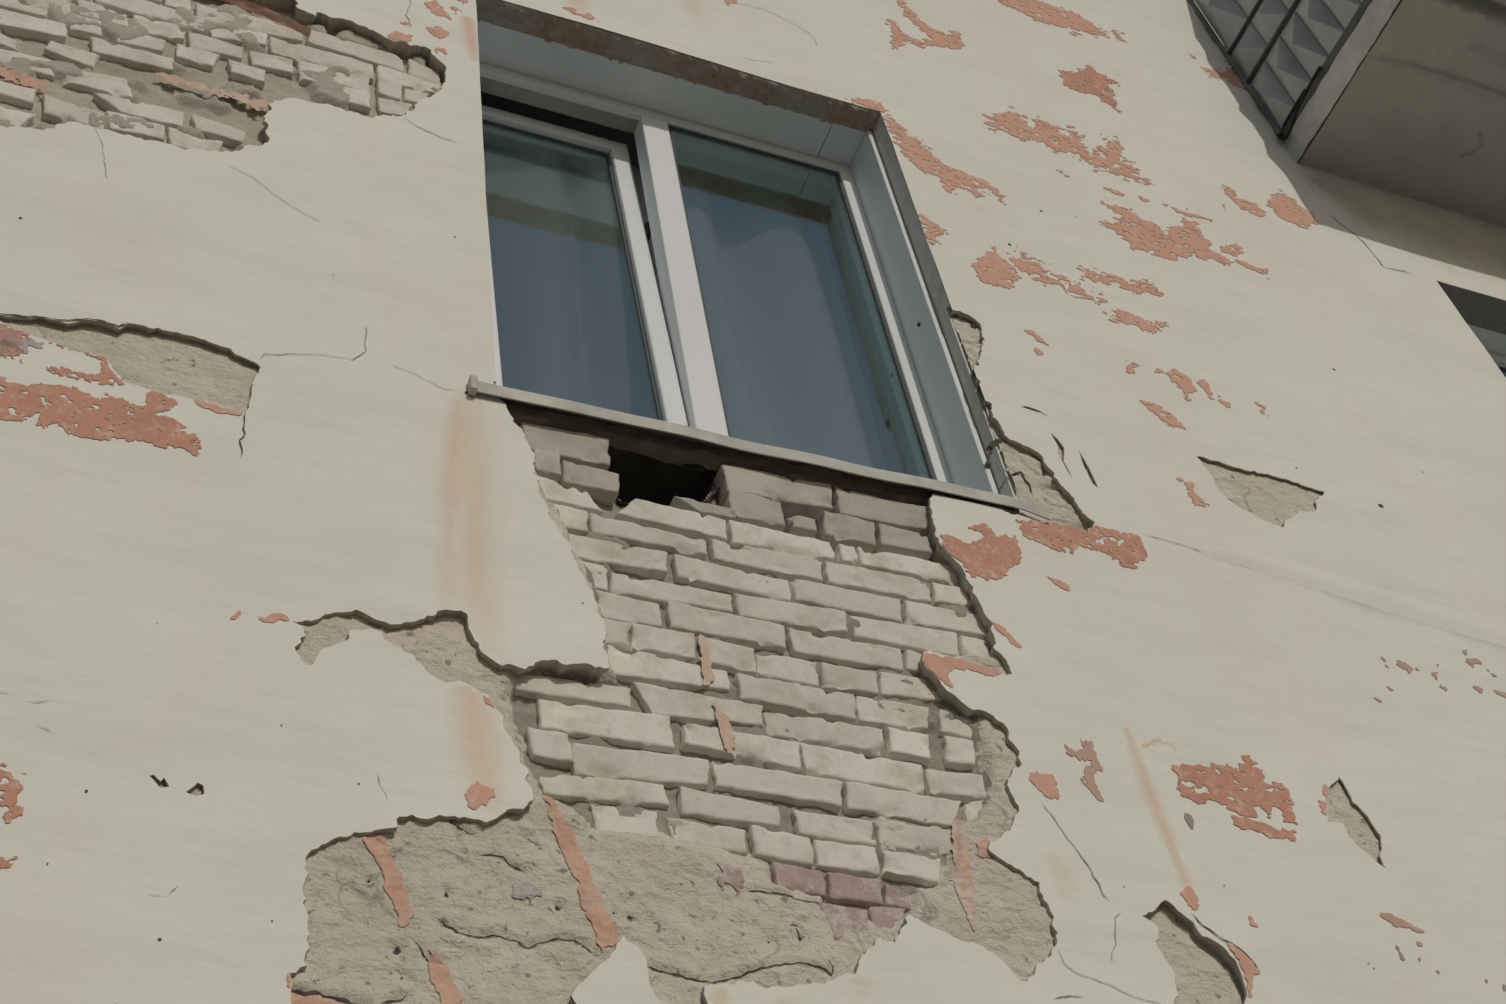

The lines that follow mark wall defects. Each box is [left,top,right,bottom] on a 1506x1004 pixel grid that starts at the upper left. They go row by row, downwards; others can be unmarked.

flaking render [0,0,1006,205]
peeling [1058,65,1122,112]
peeling [983,106,1321,279]
peeling [971,243,1168,334]
flaking render [0,315,260,456]
crack [261,328,452,390]
crack [238,412,246,456]
flaking render [1177,456,1325,527]
flaking render [259,310,1148,1004]
peeling [1171,755,1298,841]
flaking render [1318,777,1386,868]
flaking render [1142,886,1260,1004]